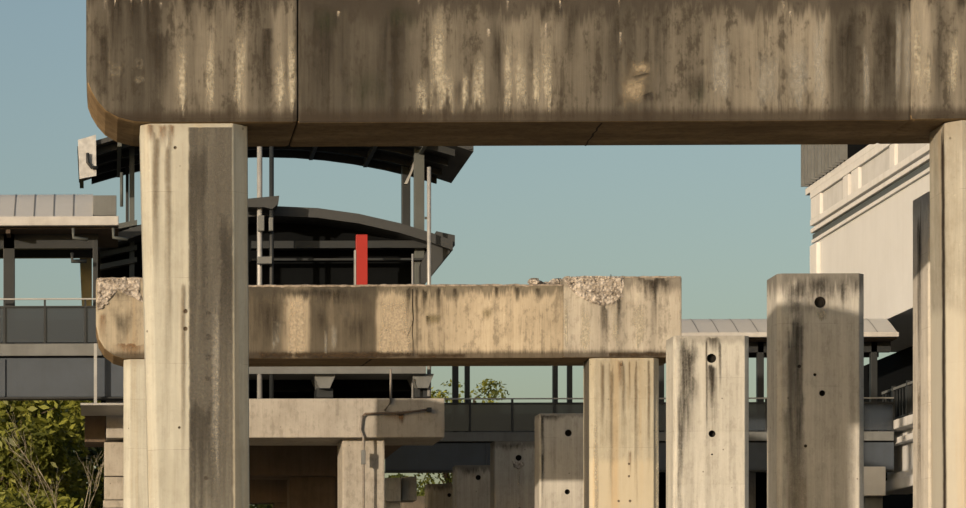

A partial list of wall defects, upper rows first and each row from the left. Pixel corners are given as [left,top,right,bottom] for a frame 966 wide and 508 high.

water stain [237,46,245,100]
water stain [278,52,294,106]
water stain [433,34,451,104]
water stain [463,68,483,104]
water stain [497,48,551,105]
spalling [96,277,143,310]
water stain [182,127,233,508]
water stain [260,288,465,358]
spalling [562,276,624,306]
water stain [609,312,666,366]
water stain [644,278,666,302]
water stain [706,338,721,407]